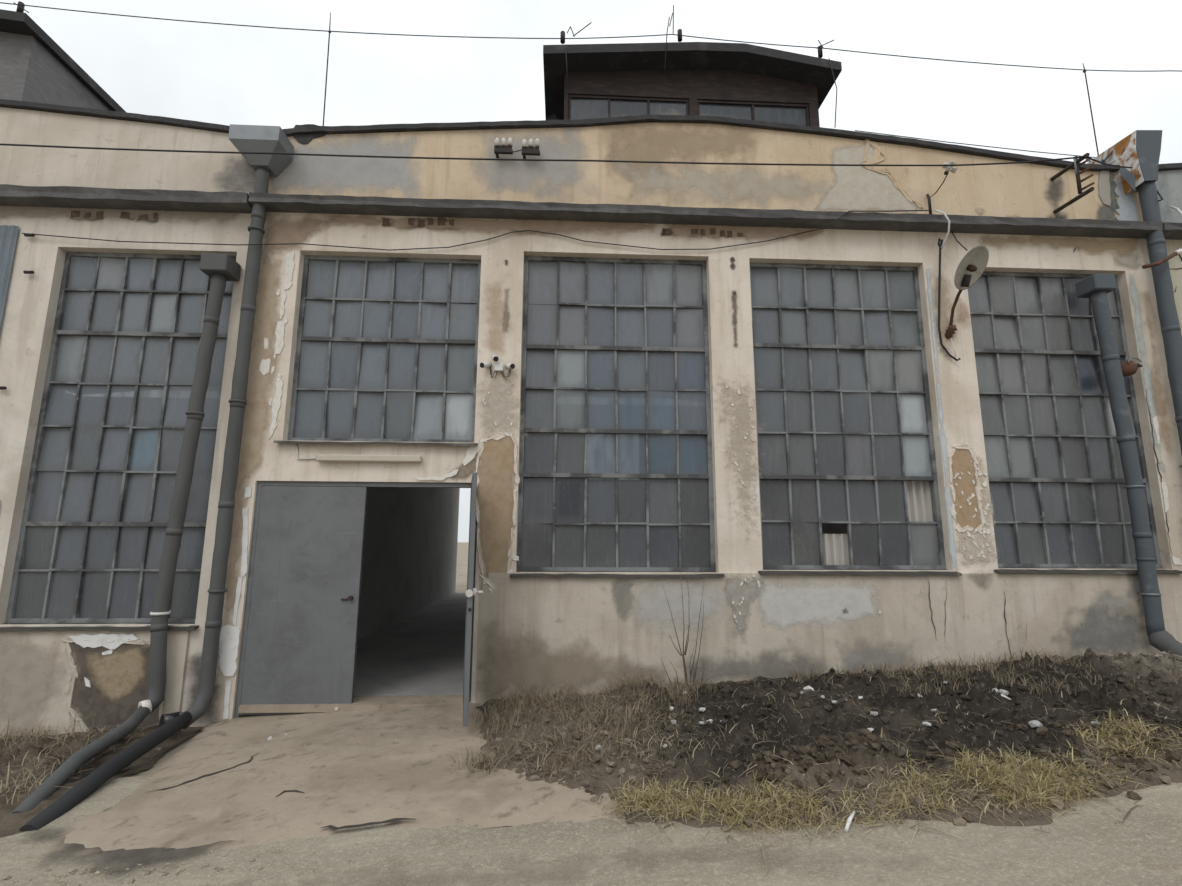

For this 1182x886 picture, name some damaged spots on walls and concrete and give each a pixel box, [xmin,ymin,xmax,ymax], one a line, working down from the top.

damp [611,125,830,203]
flaking render [816,139,924,213]
peeling [218,252,295,720]
flaking render [416,427,520,594]
flaking render [947,443,997,565]
crack [928,581,947,643]
spalling [61,633,164,732]